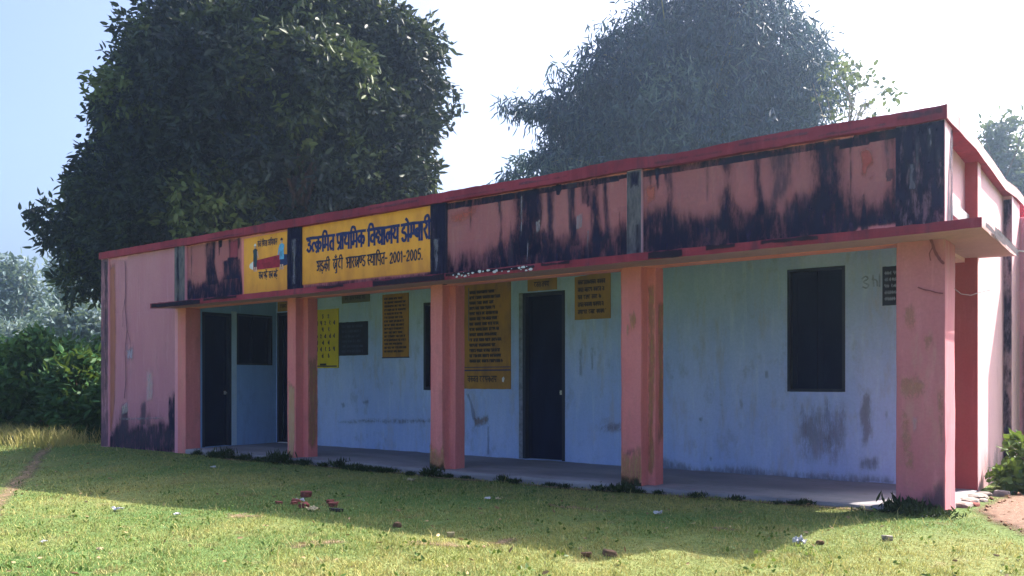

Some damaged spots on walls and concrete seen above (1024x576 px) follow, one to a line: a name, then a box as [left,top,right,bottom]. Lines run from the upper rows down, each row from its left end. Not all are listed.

water stain [101,259,175,452]
water stain [151,234,242,308]
water stain [287,108,953,289]